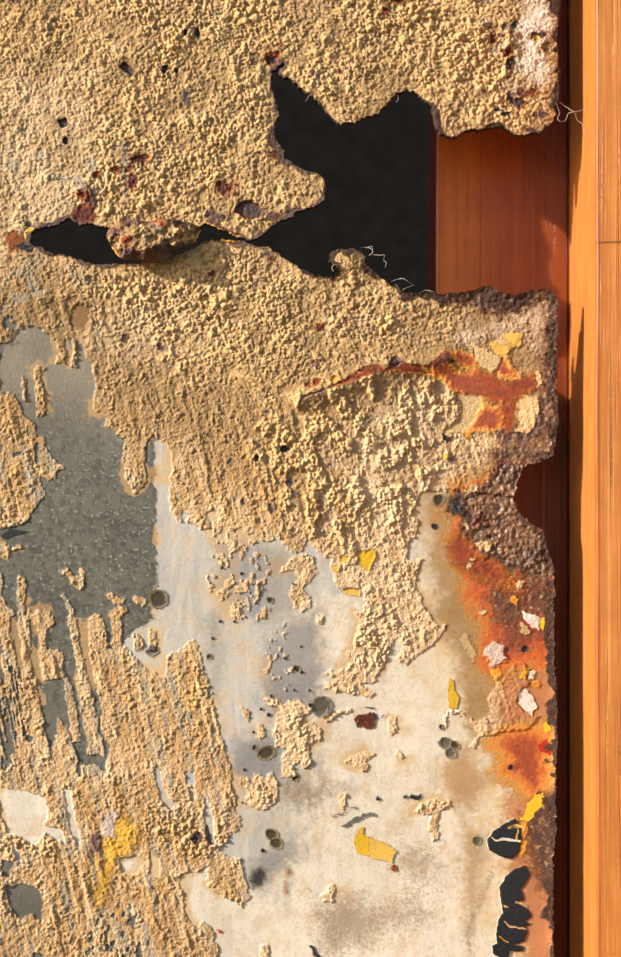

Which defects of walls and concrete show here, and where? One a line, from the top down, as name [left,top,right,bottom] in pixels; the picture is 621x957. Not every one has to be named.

spalling [119,62,135,76]
corrosion [542,0,561,109]
peeling [171,88,189,105]
spalling [58,117,68,144]
corrosion [301,248,559,957]
peeling [0,315,545,957]
peeling [537,722,552,755]